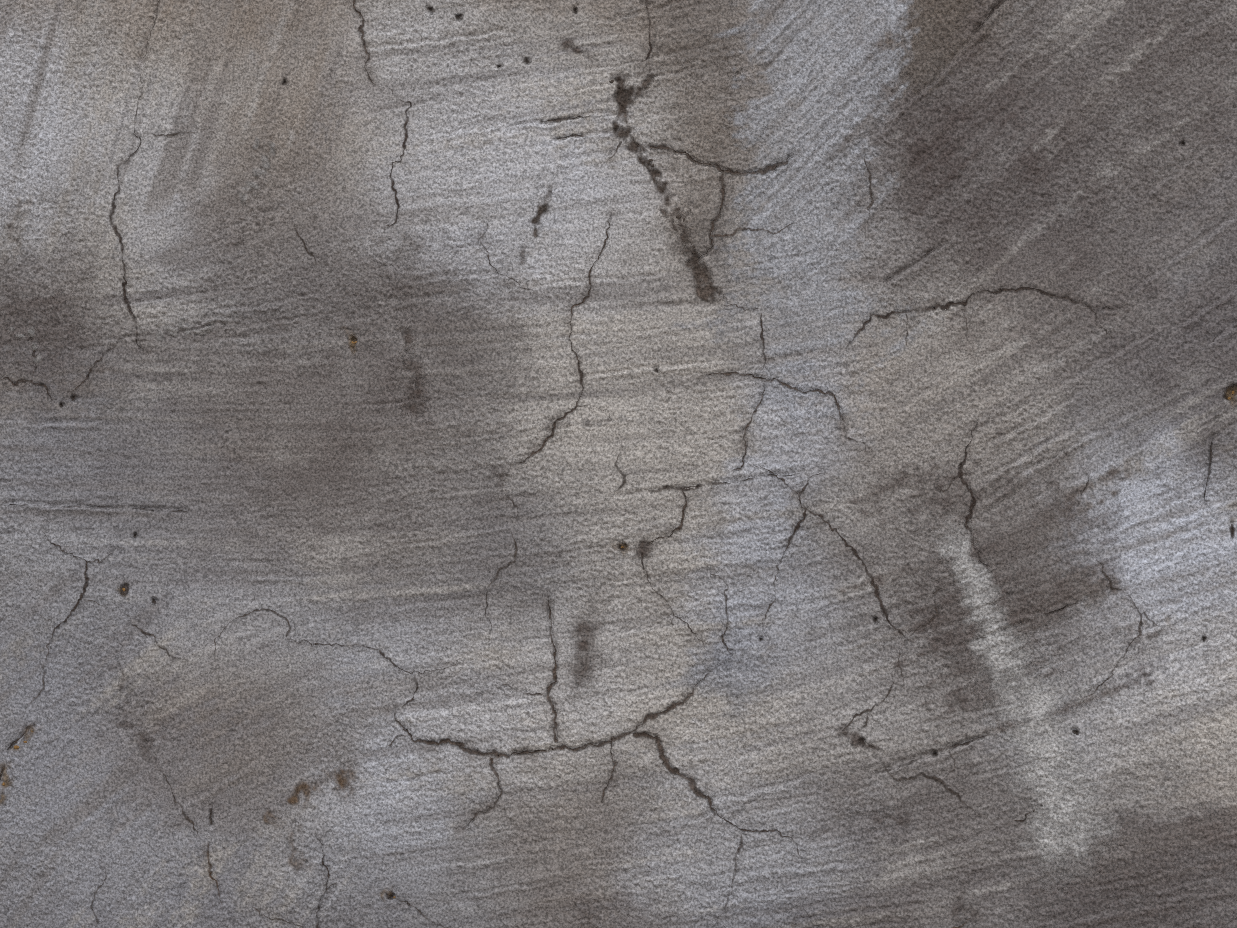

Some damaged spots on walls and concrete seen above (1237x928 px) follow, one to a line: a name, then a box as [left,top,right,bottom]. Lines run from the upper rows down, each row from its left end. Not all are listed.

crack [1,0,194,400]
crack [353,0,412,226]
crack [485,216,626,630]
crack [641,489,729,652]
crack [706,304,941,729]
crack [864,158,874,219]
crack [848,287,1122,345]
crack [214,596,800,906]